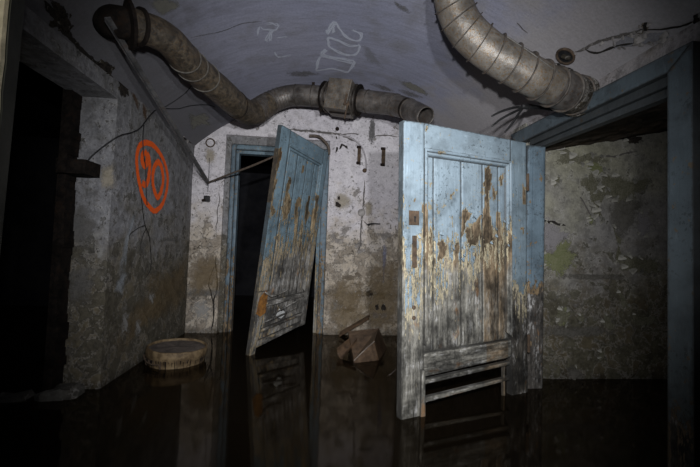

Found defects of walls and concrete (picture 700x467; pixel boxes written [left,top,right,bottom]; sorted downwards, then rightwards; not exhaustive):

water stain [332,245,397,332]
peeling [544,218,578,278]
peeling [555,147,655,265]